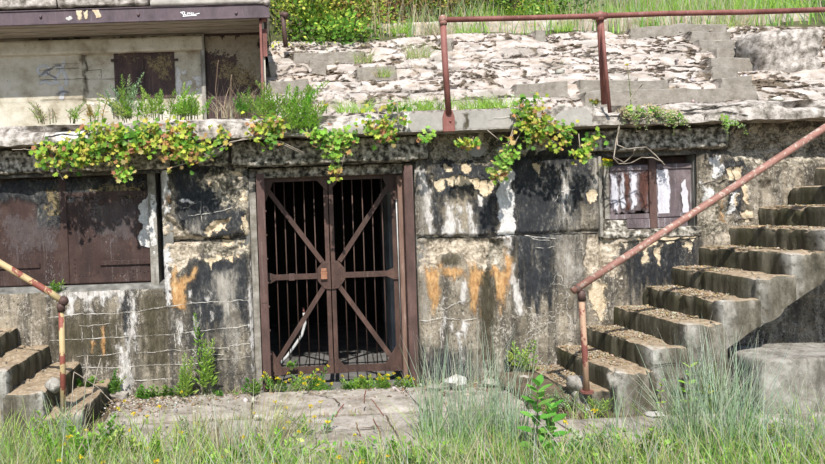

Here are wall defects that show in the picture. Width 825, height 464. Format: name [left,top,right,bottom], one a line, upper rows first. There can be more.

peeling [55,131,88,142]
spalling [404,109,515,197]
peeling [610,171,637,211]
spalling [637,122,825,266]
damp [49,253,252,397]
corrosion [170,266,197,309]
spalling [138,163,252,305]
corrosion [425,255,513,314]
damp [414,147,604,316]
spalling [583,230,629,280]
damp [620,239,700,305]
damp [723,301,735,317]